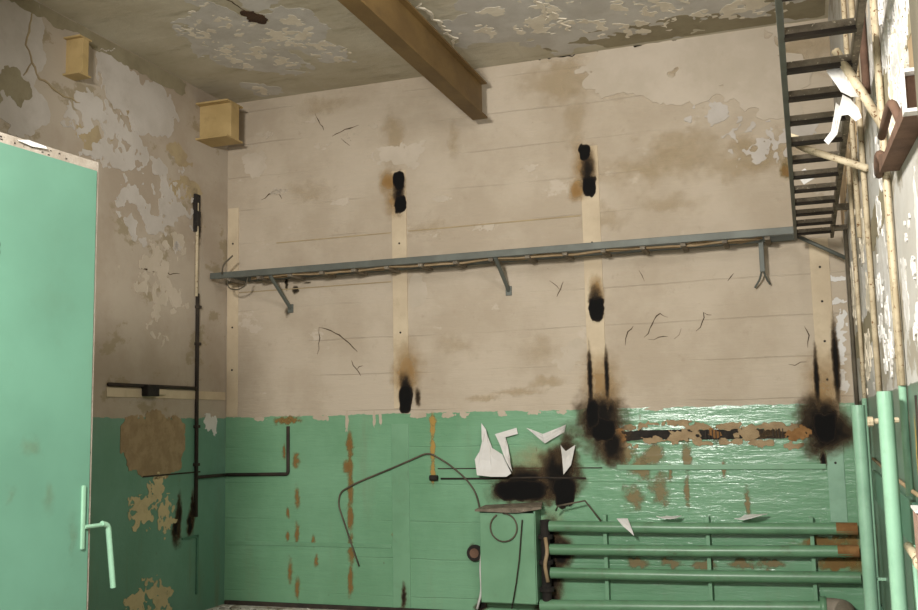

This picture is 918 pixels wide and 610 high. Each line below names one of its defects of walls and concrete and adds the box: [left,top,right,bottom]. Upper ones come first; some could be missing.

peeling [171,0,357,76]
peeling [0,0,203,347]
peeling [435,0,914,400]
peeling [900,167,918,346]
peeling [123,575,174,610]
corrosion [286,490,300,542]
corrosion [343,433,354,594]
peeling [622,419,804,450]